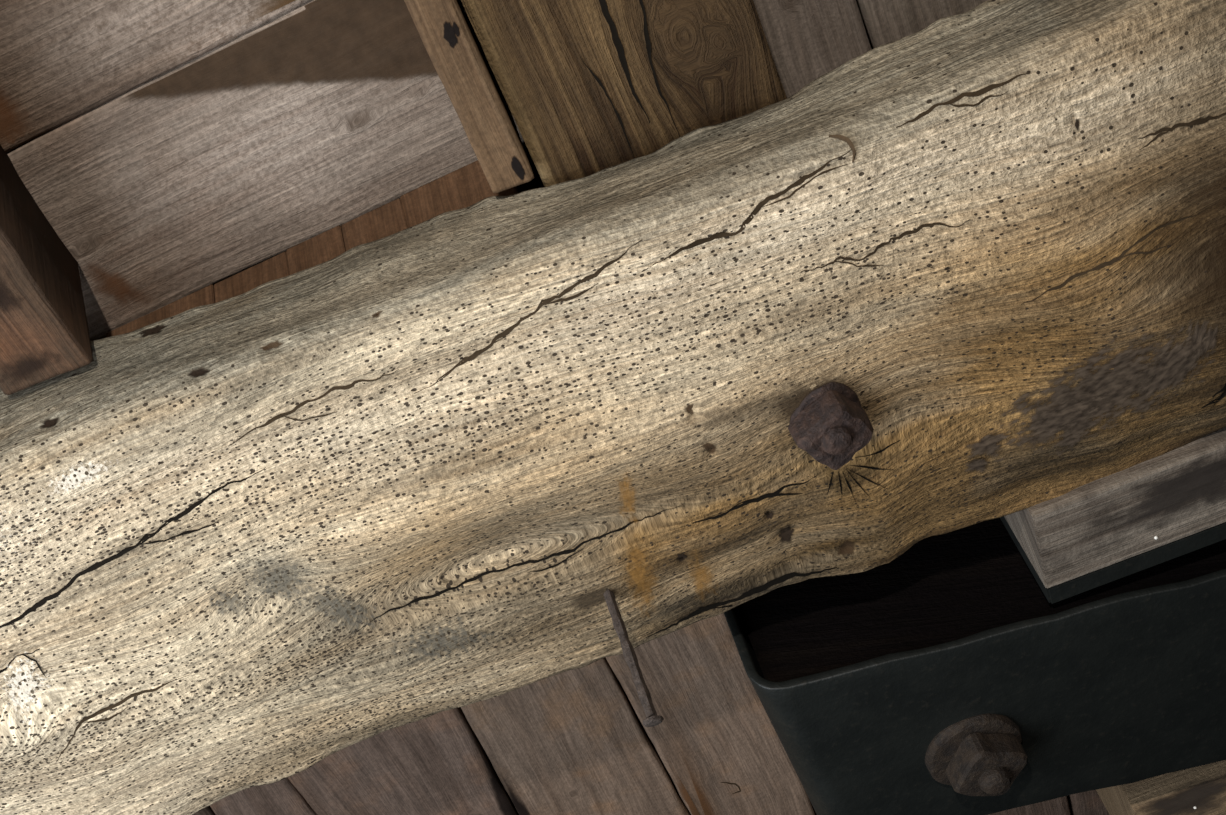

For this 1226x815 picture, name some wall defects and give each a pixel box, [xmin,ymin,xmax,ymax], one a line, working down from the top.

crack [580,0,680,159]
crack [896,71,1030,128]
crack [1137,112,1226,150]
crack [229,150,851,446]
leakage [1130,460,1226,520]
crack [0,467,266,628]
crack [353,440,900,638]
crack [0,649,46,677]
crack [56,675,189,762]